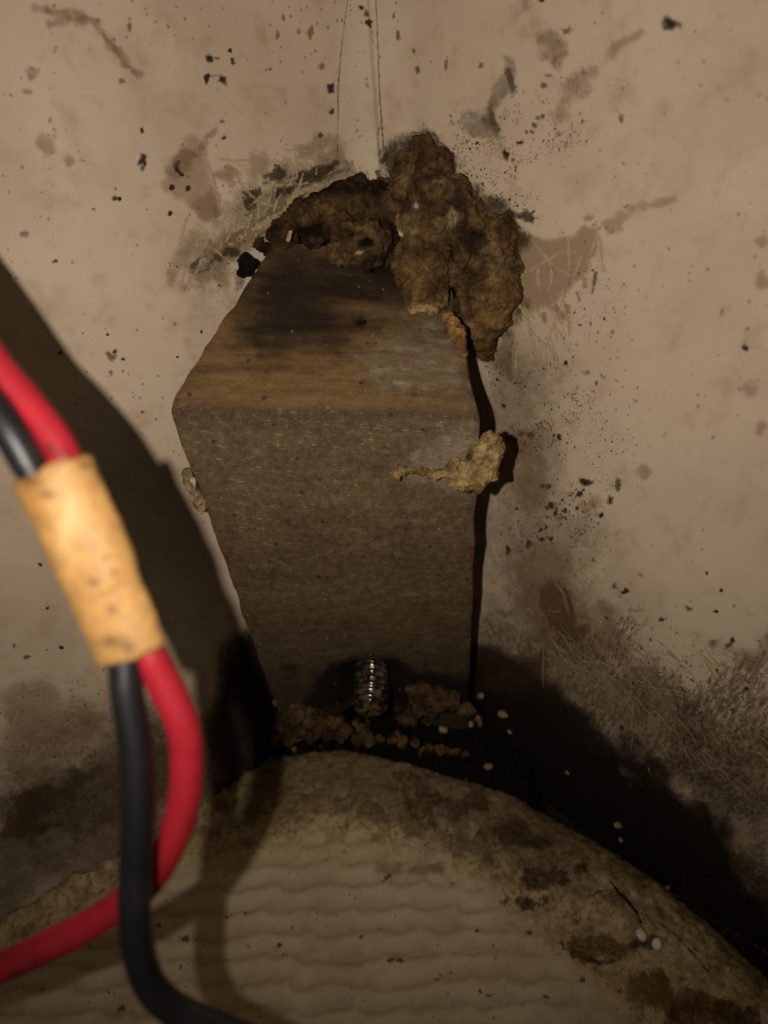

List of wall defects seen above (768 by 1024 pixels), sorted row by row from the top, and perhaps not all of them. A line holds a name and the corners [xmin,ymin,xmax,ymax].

peeling [170,133,369,302]